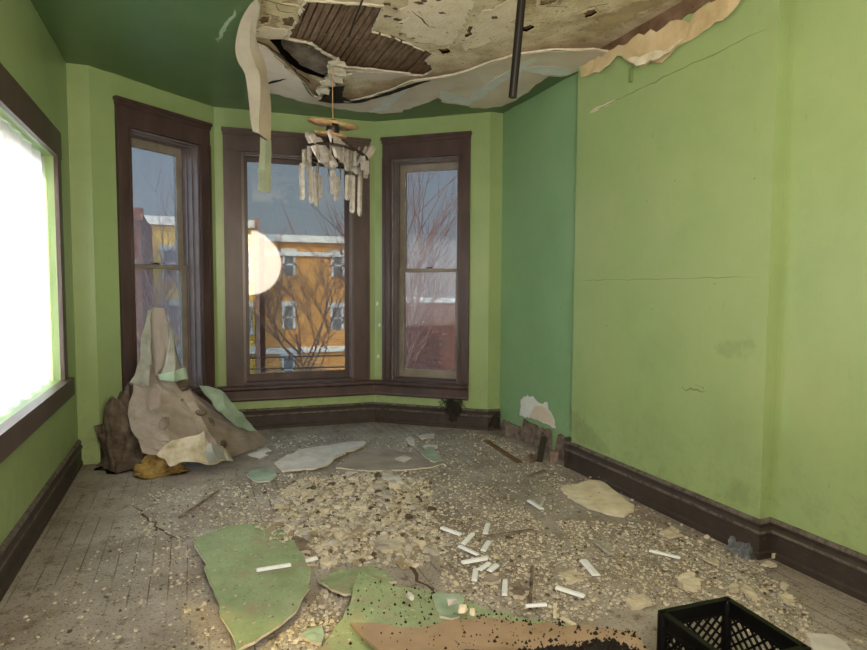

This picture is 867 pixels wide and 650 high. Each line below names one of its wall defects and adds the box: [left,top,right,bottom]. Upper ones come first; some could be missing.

peeling [256,0,606,114]
crack [592,29,766,112]
peeling [519,395,556,429]